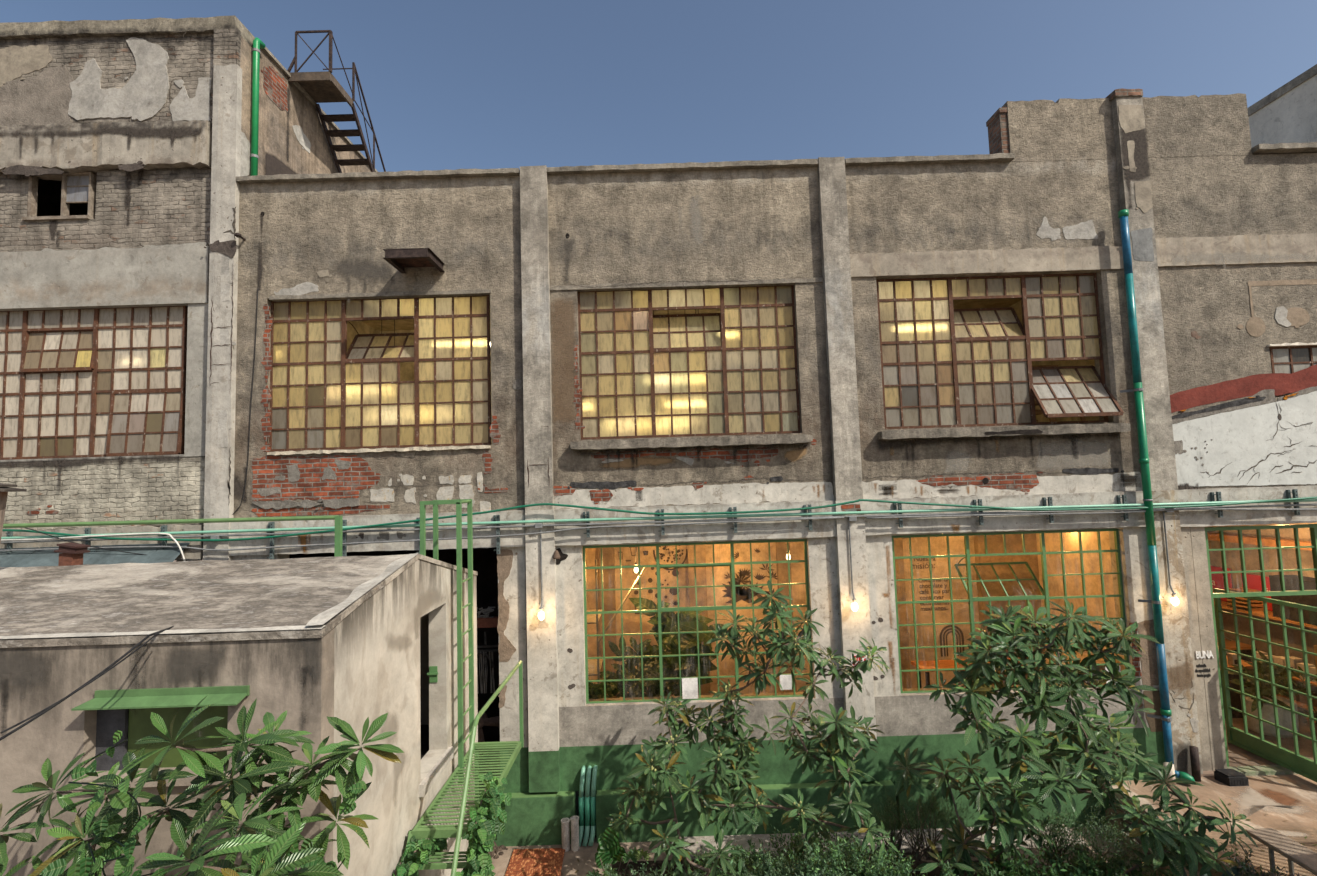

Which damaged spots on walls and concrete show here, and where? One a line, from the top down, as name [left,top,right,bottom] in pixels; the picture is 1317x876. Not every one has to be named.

flaking render [0,37,212,127]
spalling [1,165,64,177]
spalling [118,161,145,172]
flaking render [1118,105,1153,213]
flaking render [1036,217,1098,241]
flaking render [251,270,508,517]
flaking render [527,461,613,504]
flaking render [591,447,783,484]
flaking render [916,471,1043,495]
crack [1201,404,1317,488]
spalling [356,528,406,540]
peeling [497,549,518,662]